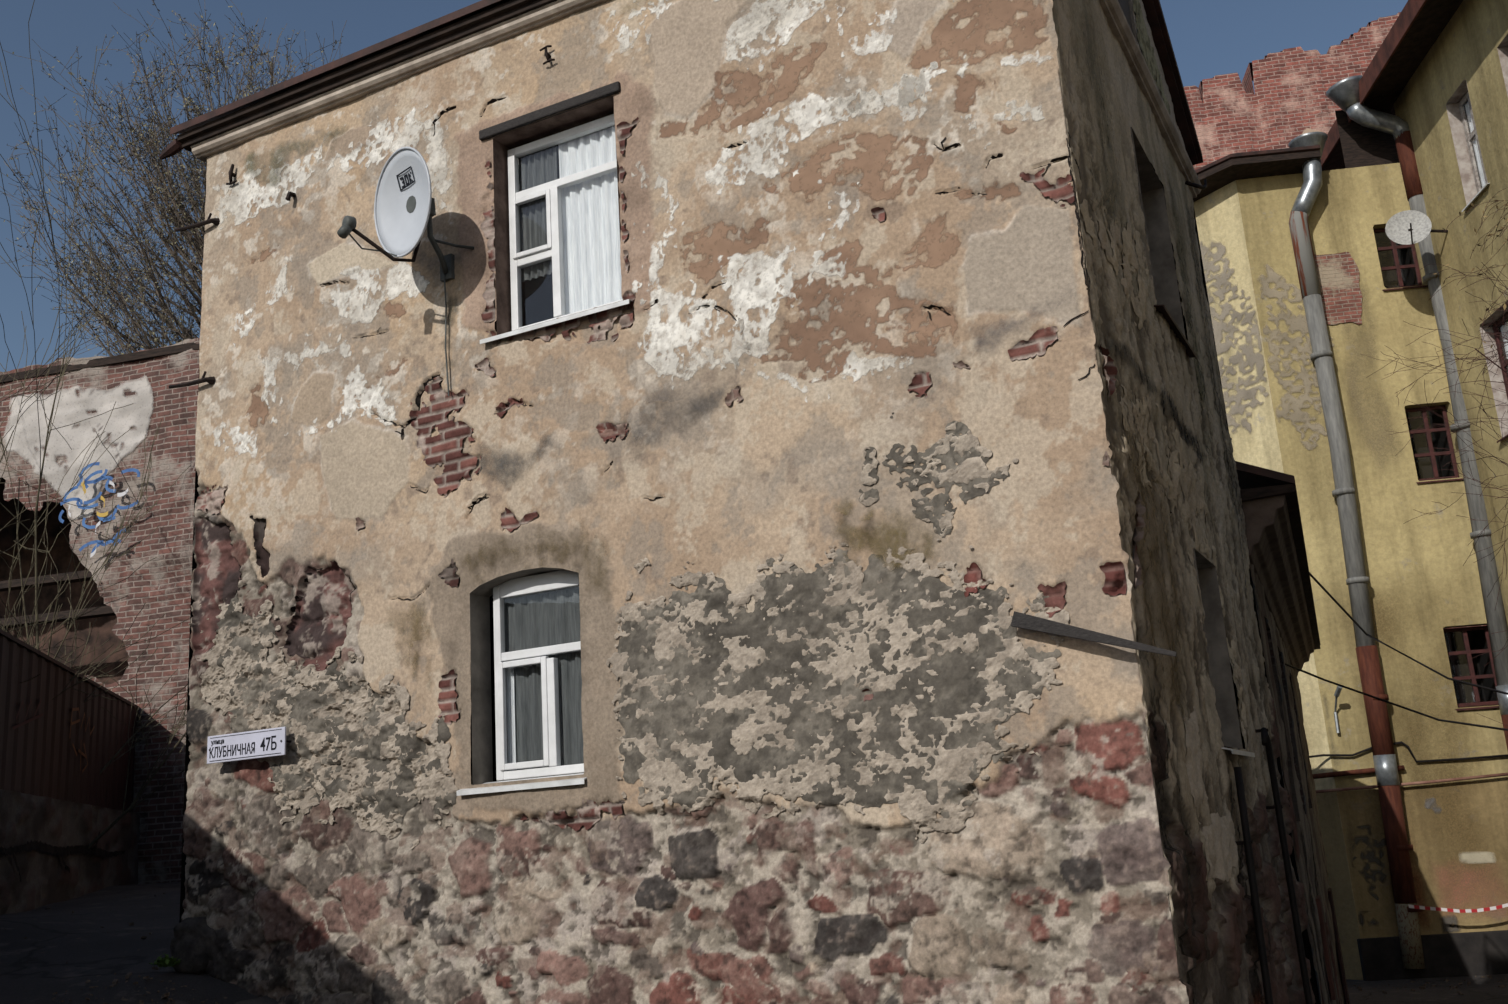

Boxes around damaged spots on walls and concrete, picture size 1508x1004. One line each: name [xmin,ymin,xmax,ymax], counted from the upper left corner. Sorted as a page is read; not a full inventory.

flaking render [4,376,153,519]
spalling [213,248,481,497]
flaking render [475,0,1051,406]
spalling [1008,326,1060,361]
flaking render [955,168,1149,330]
peeling [1200,241,1327,450]
spalling [1314,252,1362,347]
spalling [189,484,461,849]
spalling [520,421,1069,843]